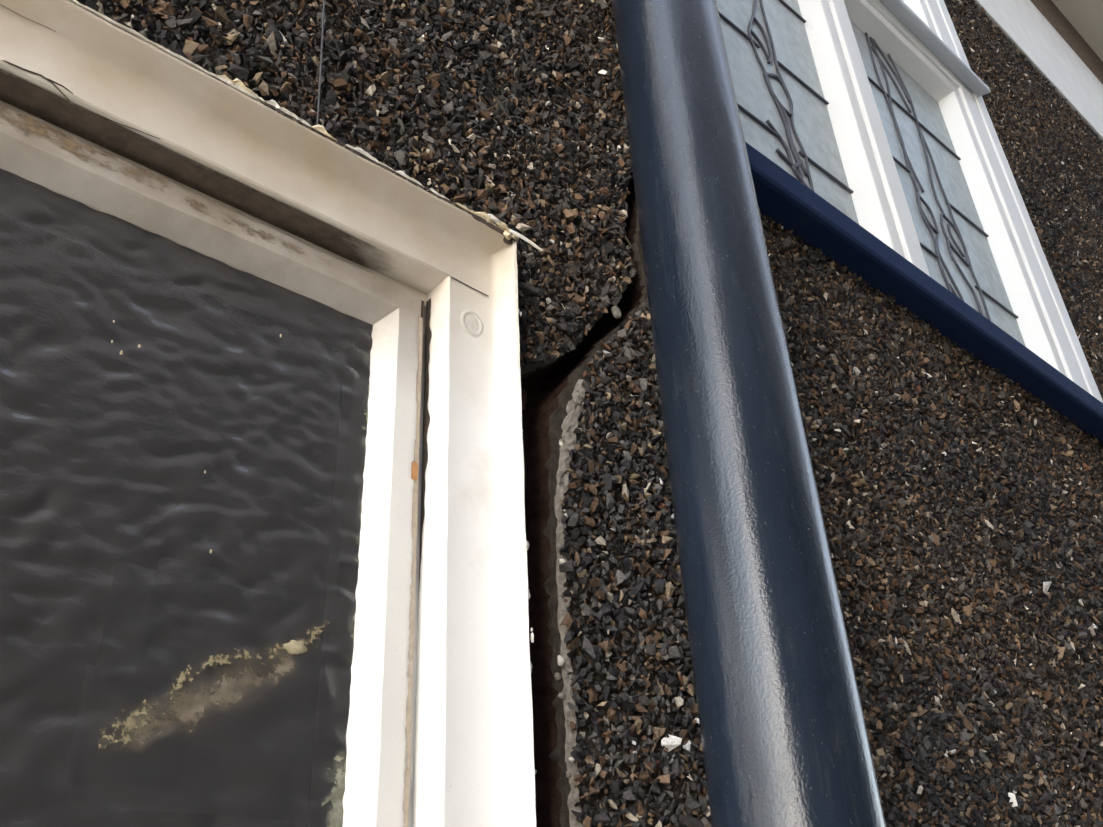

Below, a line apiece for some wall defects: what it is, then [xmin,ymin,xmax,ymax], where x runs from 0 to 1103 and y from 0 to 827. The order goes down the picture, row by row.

crack [546,171,646,381]
spalling [554,379,585,827]